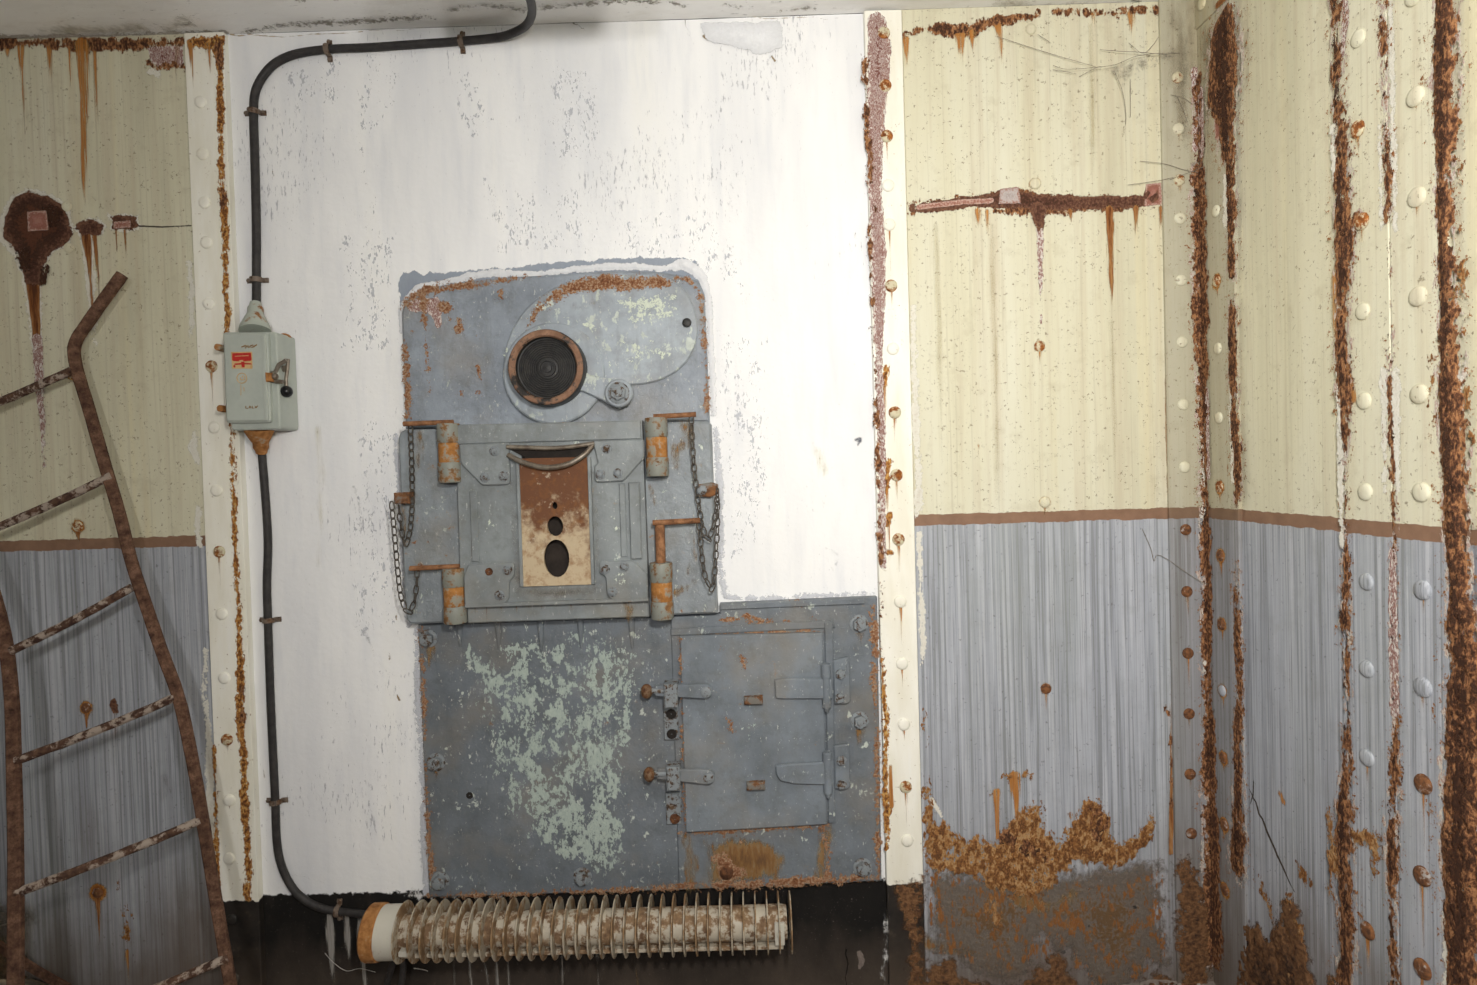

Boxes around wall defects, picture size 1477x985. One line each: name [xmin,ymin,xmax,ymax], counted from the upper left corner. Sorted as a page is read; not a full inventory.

rust [0,34,233,333]
rust [400,0,1477,985]
rust [80,698,119,728]
rust [211,423,254,902]
rust [89,881,134,971]